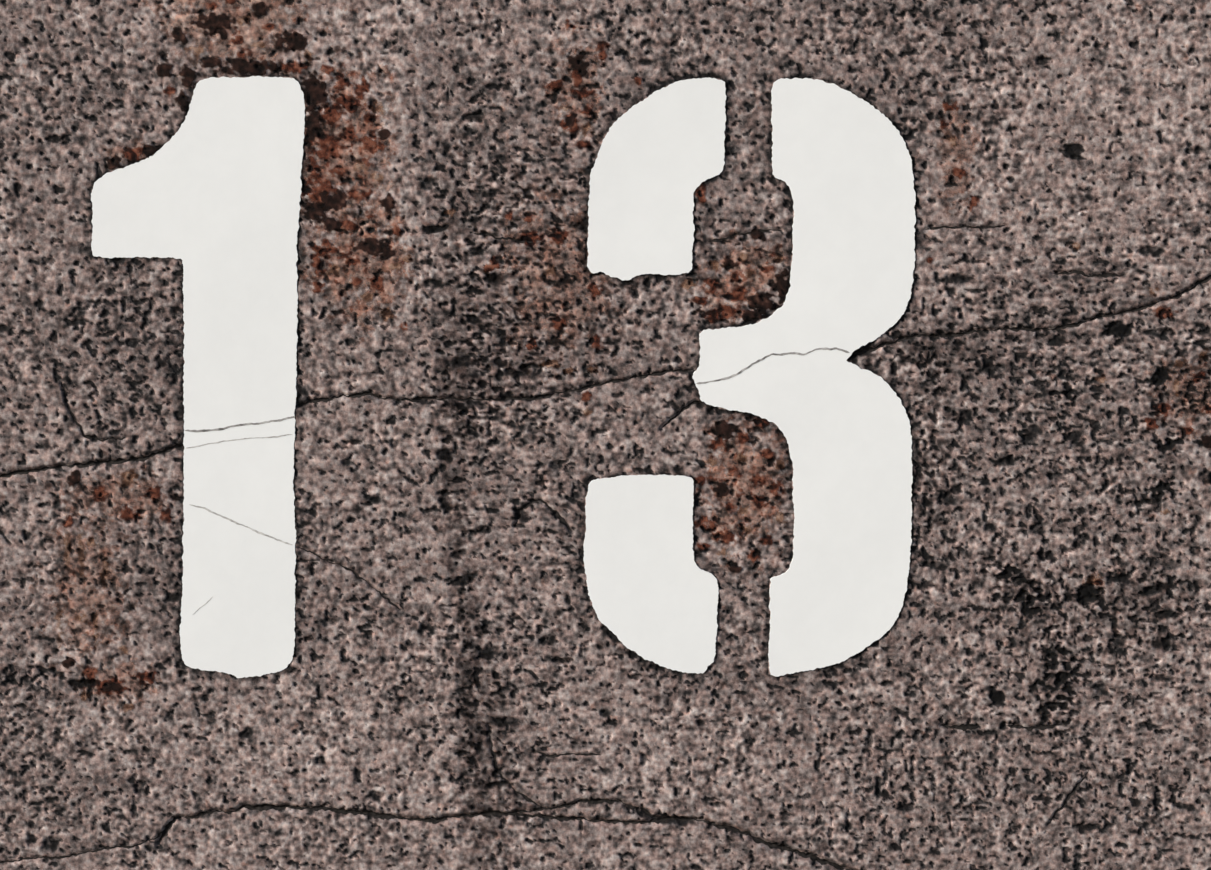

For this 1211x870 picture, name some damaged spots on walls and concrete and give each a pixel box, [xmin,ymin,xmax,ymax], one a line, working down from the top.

rust [104,139,161,170]
rust [142,0,415,341]
rust [695,182,706,203]
rust [681,229,791,325]
crack [1053,270,1124,278]
crack [0,275,1211,477]
rust [693,411,793,573]
crack [0,725,850,870]